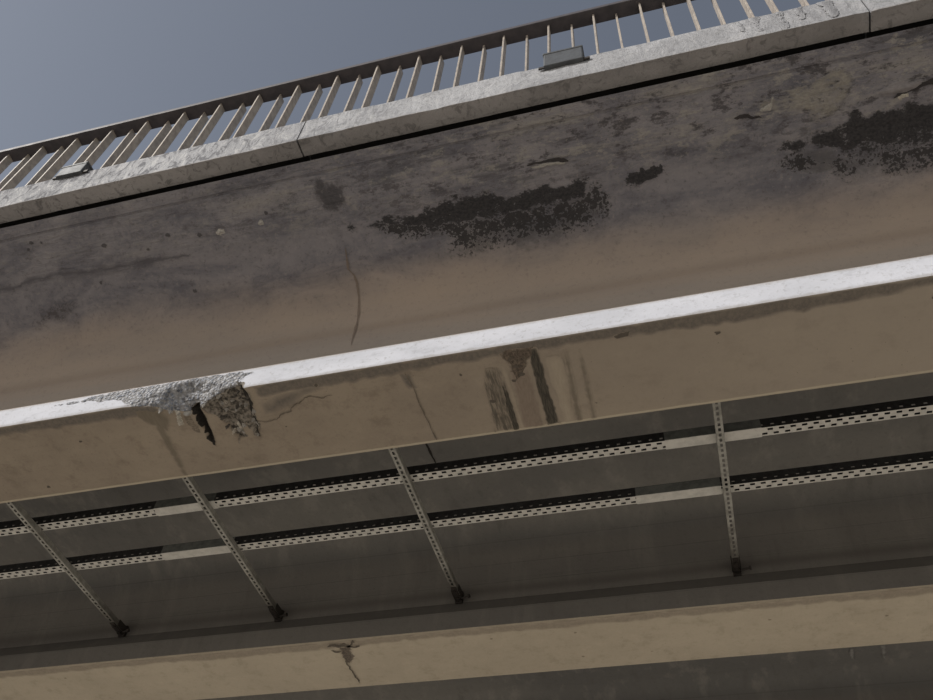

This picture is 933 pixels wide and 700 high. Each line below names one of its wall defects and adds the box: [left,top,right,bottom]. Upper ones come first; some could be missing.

crack [345,248,360,345]
damp [251,276,933,415]
spalling [54,372,262,476]